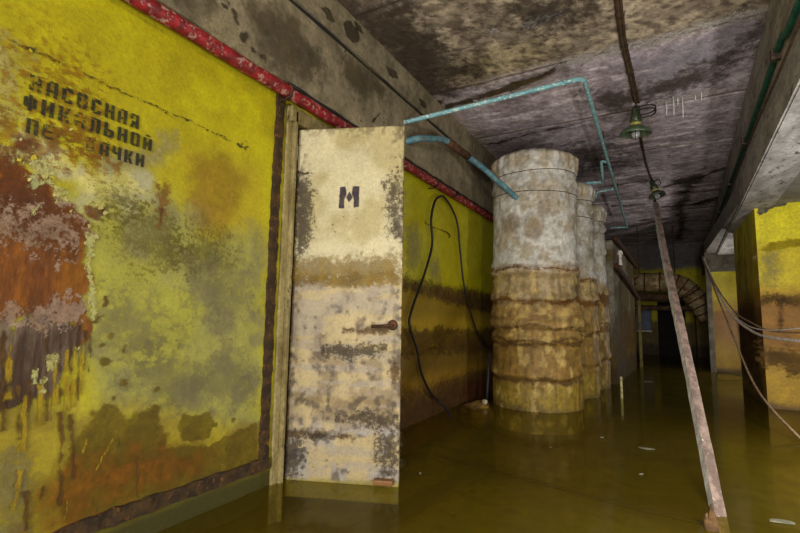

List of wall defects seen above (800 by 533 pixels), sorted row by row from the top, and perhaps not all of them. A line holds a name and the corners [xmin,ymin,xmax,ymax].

crack [12,41,248,150]
water stain [337,0,485,104]
water stain [552,4,768,114]
water stain [555,132,641,177]
peeling [0,92,122,347]
water stain [292,166,493,314]
water stain [319,340,388,363]
water stain [401,325,494,359]
water stain [735,292,800,401]
water stain [0,312,259,531]
mould [283,429,310,483]
water stain [334,365,493,481]